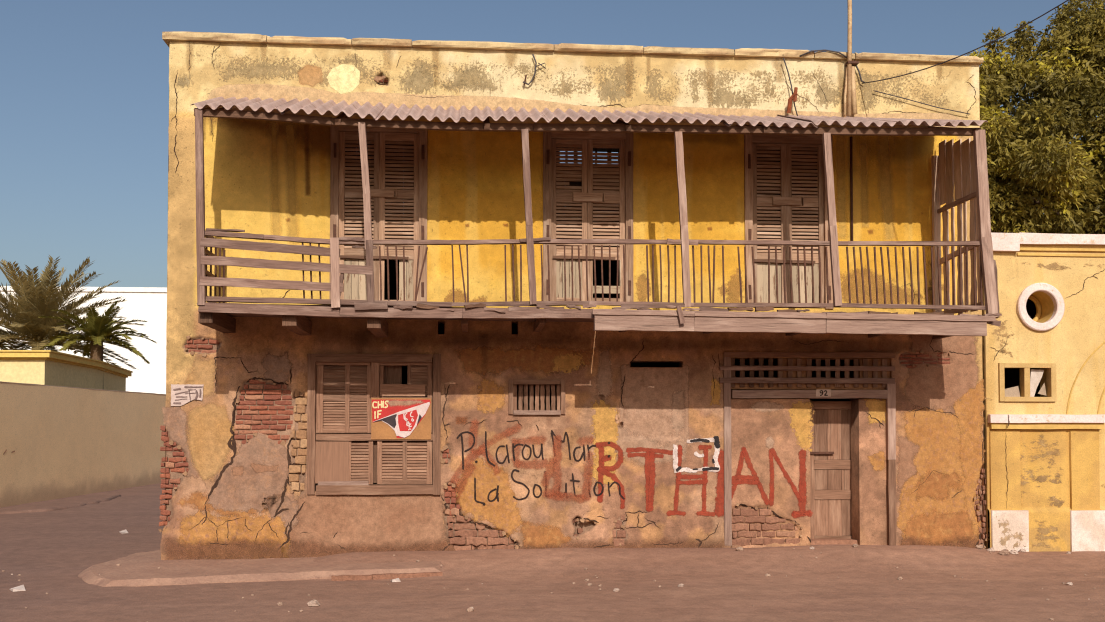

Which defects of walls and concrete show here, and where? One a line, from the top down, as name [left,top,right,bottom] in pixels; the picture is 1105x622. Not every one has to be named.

crack [171,44,220,173]
crack [188,357,307,547]
peeling [158,335,594,558]
flaking render [732,503,803,546]
peeling [897,335,1064,548]